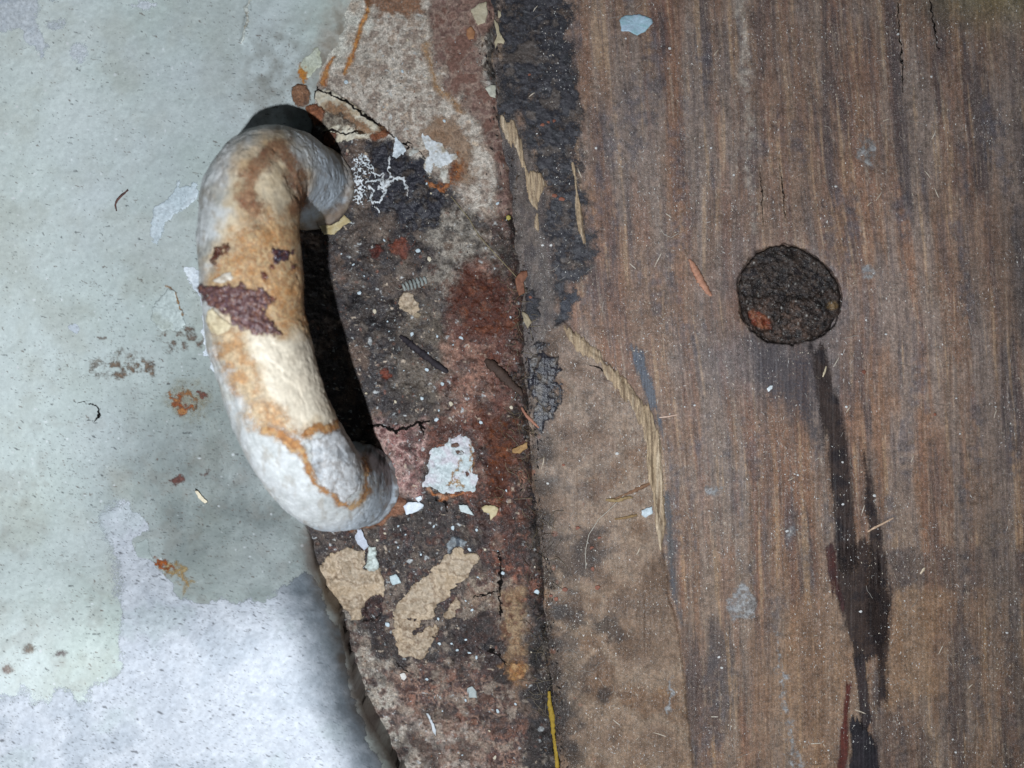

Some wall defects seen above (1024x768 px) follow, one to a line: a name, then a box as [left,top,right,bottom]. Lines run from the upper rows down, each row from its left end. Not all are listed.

crack [314,87,426,159]
corrosion [169,389,208,416]
corrosion [196,0,561,768]
peeling [403,434,498,520]
corrosion [154,559,192,591]
damp [753,342,892,768]
peeling [0,499,480,768]